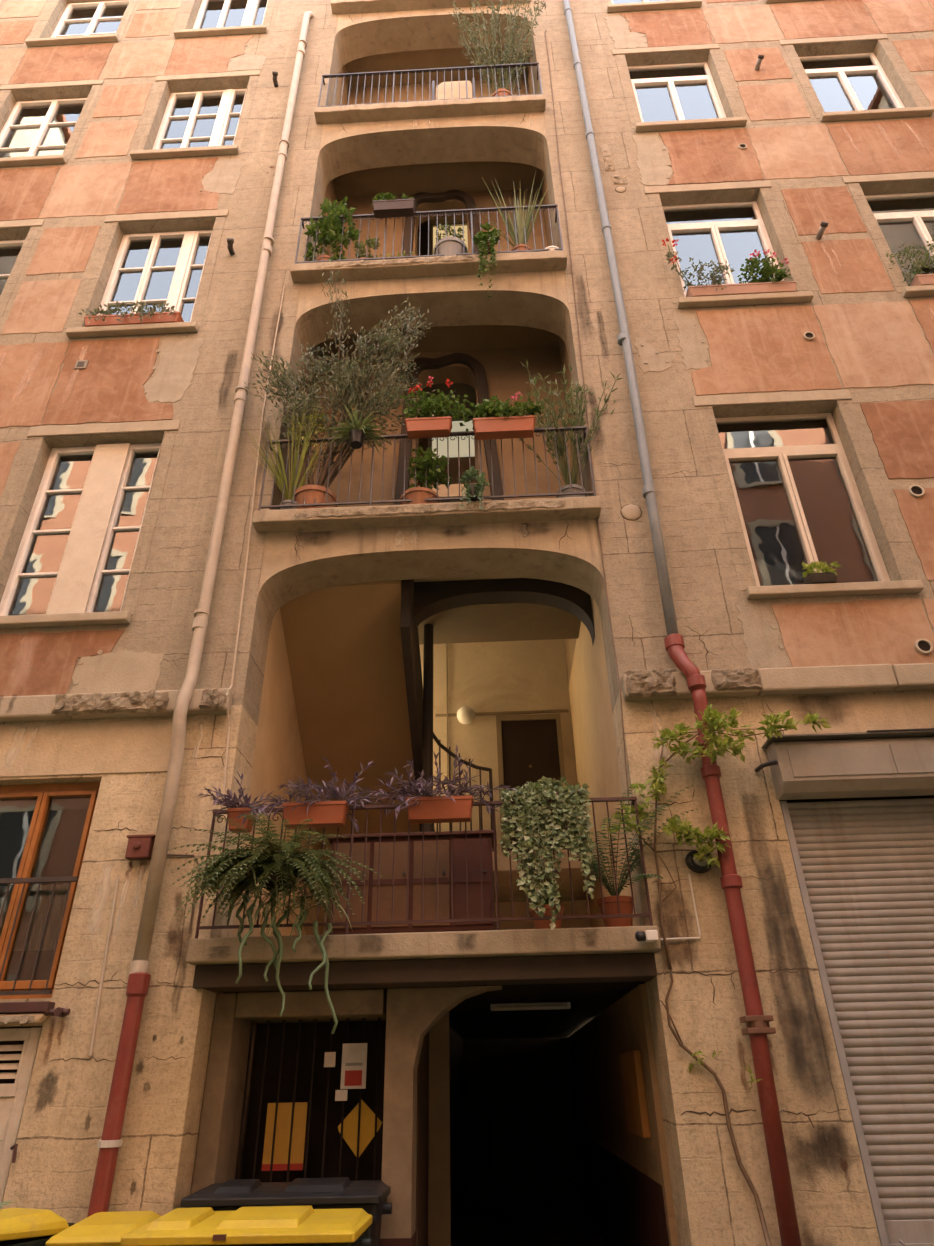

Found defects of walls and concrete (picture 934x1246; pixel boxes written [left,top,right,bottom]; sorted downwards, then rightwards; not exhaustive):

flaking render [600,134,673,186]
flaking render [144,337,203,403]
damp [749,822,810,1026]
crack [664,969,816,1004]
crack [681,1108,847,1128]